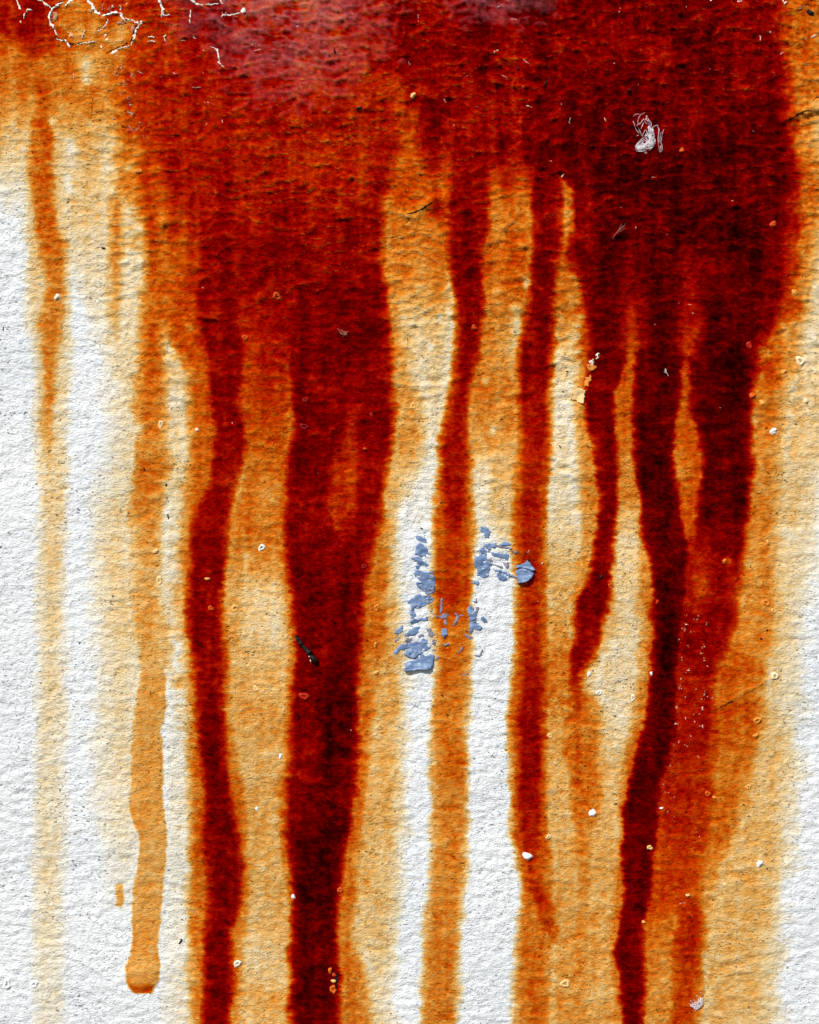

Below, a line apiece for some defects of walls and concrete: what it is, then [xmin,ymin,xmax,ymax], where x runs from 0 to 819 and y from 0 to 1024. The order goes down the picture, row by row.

crack [16,0,249,54]
rust [27,65,57,111]
rust [32,115,60,265]
rust [370,283,390,317]
rust [334,318,390,346]
rust [137,452,166,504]
peeling [472,526,536,585]
peeling [393,536,487,671]
rust [612,306,690,1024]
rust [643,287,783,1024]